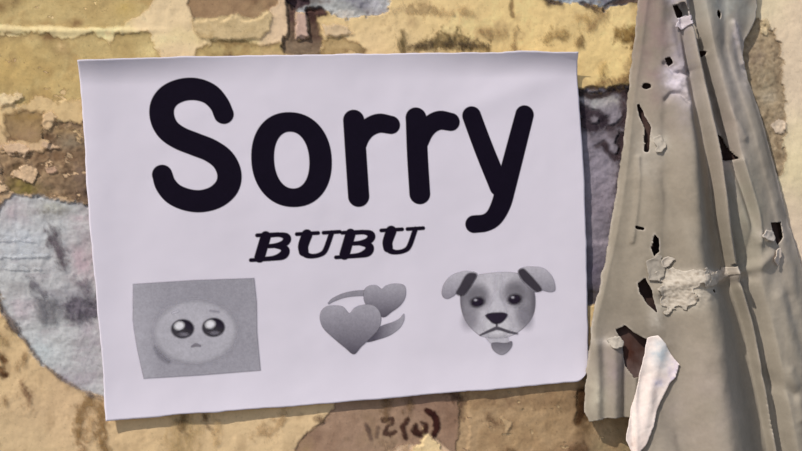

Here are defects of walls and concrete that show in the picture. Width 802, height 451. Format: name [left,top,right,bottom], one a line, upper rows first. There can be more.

spalling [0,0,160,398]
spalling [578,85,629,305]
flaking render [743,18,787,176]
leakage [75,396,108,451]